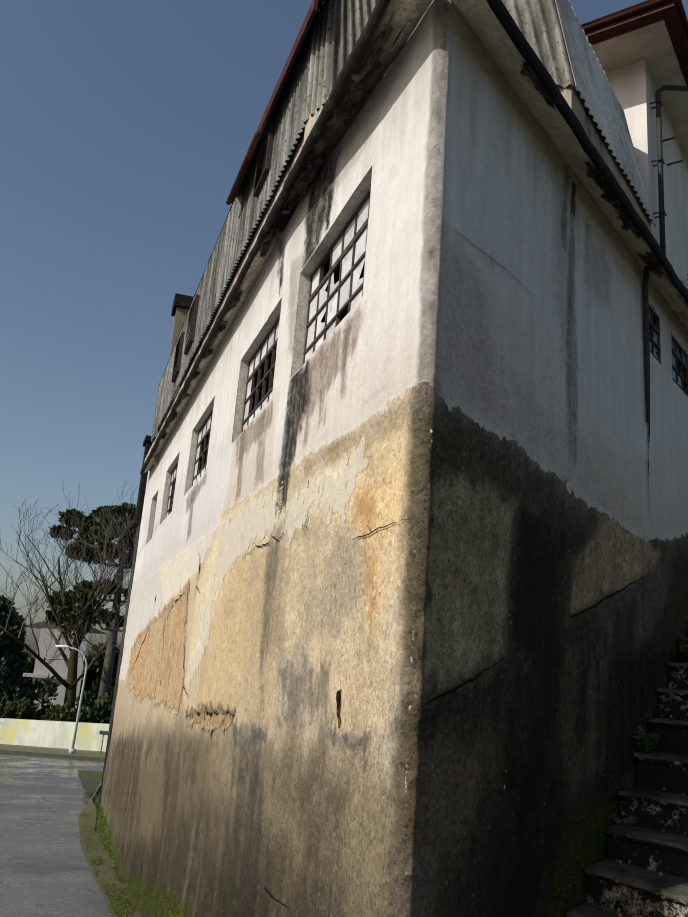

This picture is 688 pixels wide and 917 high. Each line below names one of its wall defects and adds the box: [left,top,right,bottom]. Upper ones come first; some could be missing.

spalling [520,62,555,109]
leakage [302,152,340,268]
spalling [584,161,642,239]
crack [453,229,530,292]
leakage [275,315,359,511]
crack [353,519,410,540]
flaking render [127,436,369,742]
crack [570,573,652,618]
crack [427,658,505,705]